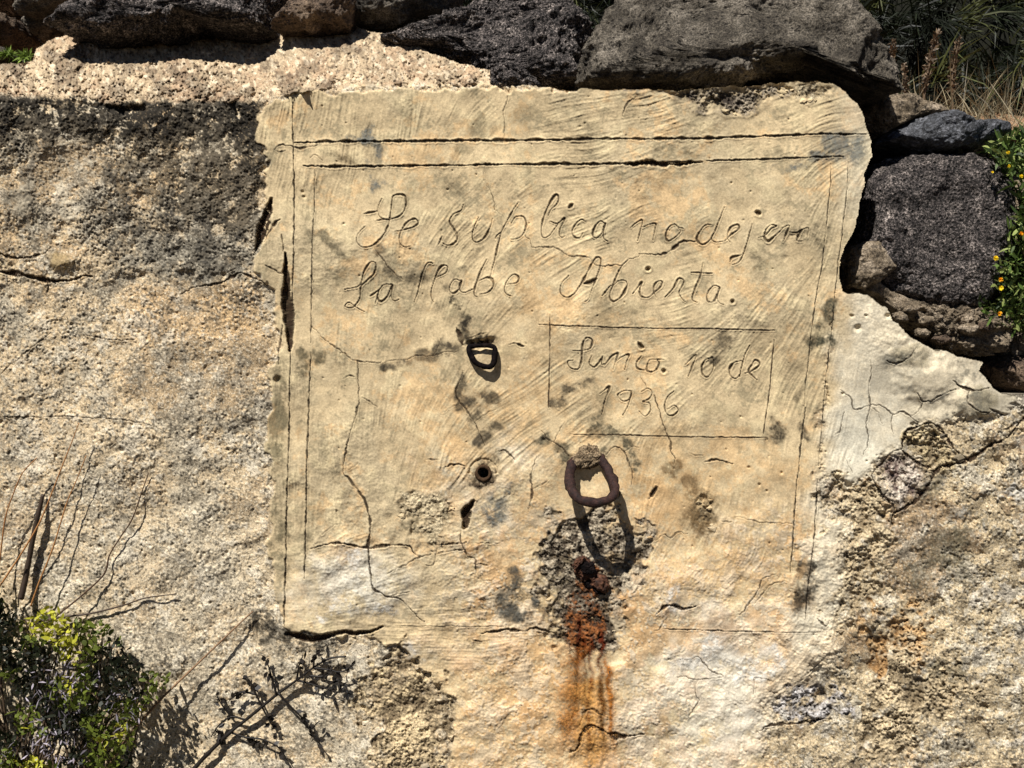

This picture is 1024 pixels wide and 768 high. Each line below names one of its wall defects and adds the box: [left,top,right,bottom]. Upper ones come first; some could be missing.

crack [0,247,92,294]
crack [182,199,568,622]
crack [839,348,1024,527]
crack [287,626,383,642]
corrosion [559,555,614,762]
spalling [530,504,657,654]
spalling [773,425,988,760]